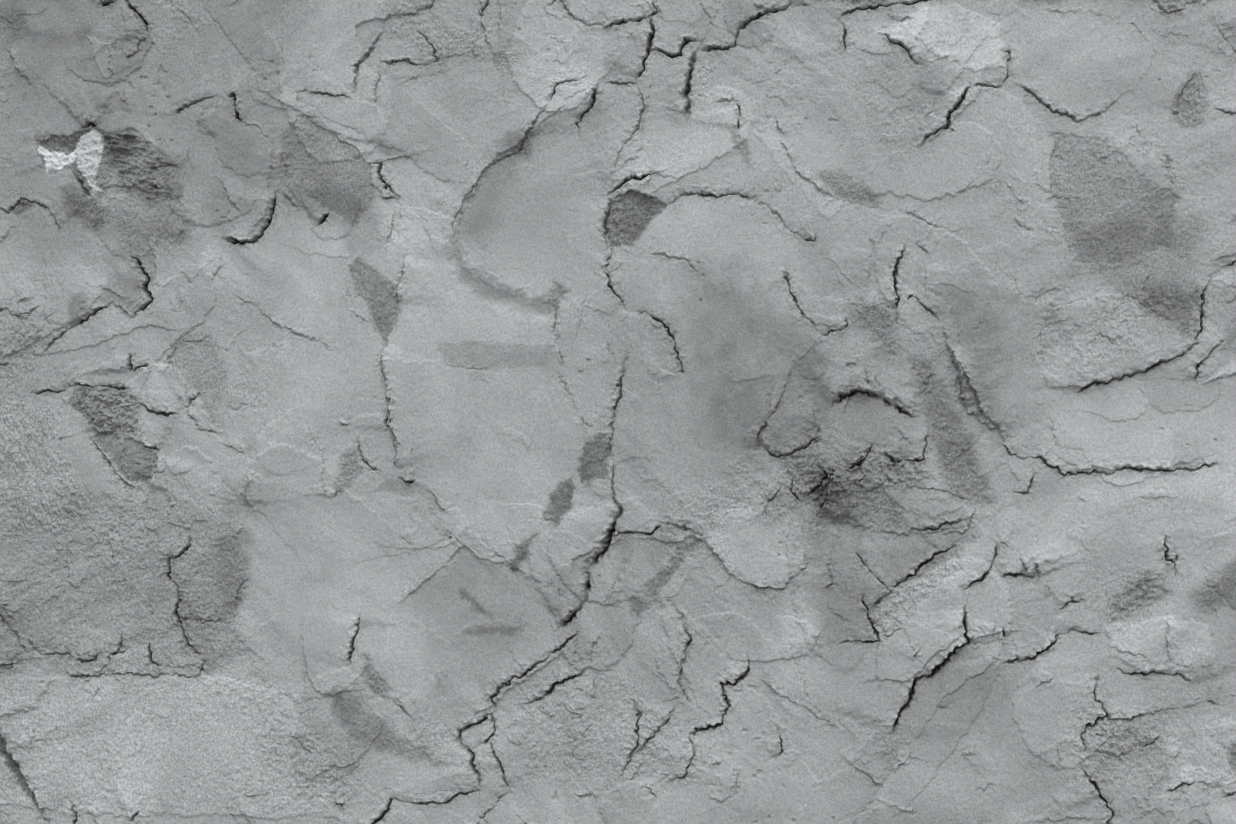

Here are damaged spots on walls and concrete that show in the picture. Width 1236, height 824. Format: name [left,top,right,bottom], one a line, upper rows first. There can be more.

crack [351,0,437,96]
crack [546,0,809,196]
spalling [814,0,946,20]
crack [920,82,1004,149]
peeling [992,48,1013,86]
spalling [36,120,183,204]
peeling [0,188,69,234]
crack [603,247,685,375]
crack [892,244,939,324]
crack [456,303,703,793]
crack [166,535,226,678]
crack [1080,674,1160,754]